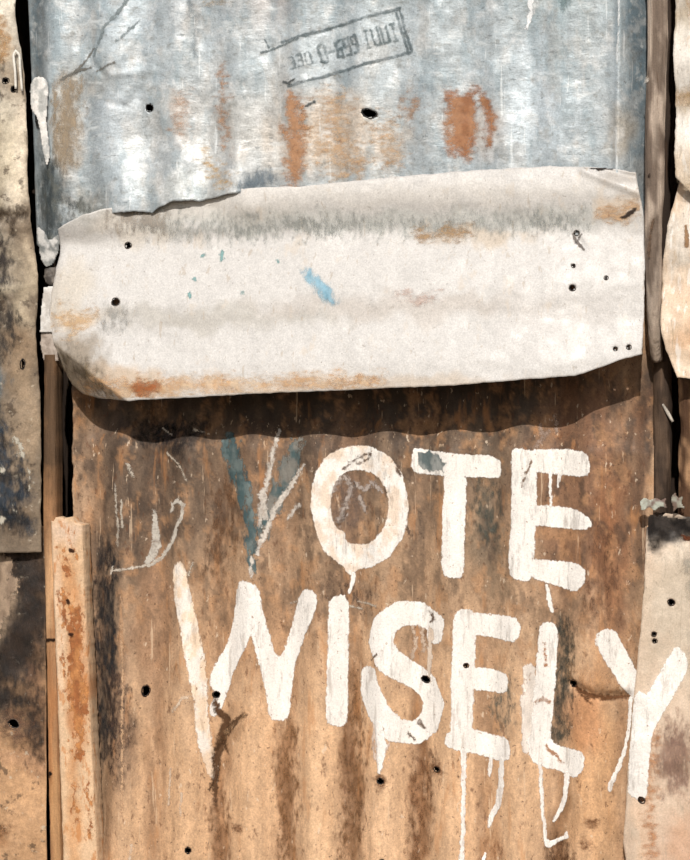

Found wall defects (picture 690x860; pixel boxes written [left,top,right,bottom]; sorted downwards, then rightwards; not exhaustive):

water stain [42,78,90,240]
rust [280,91,365,187]
rust [444,85,497,159]
water stain [0,207,29,292]
water stain [0,310,15,351]
rust [80,374,344,399]
water stain [0,421,32,532]